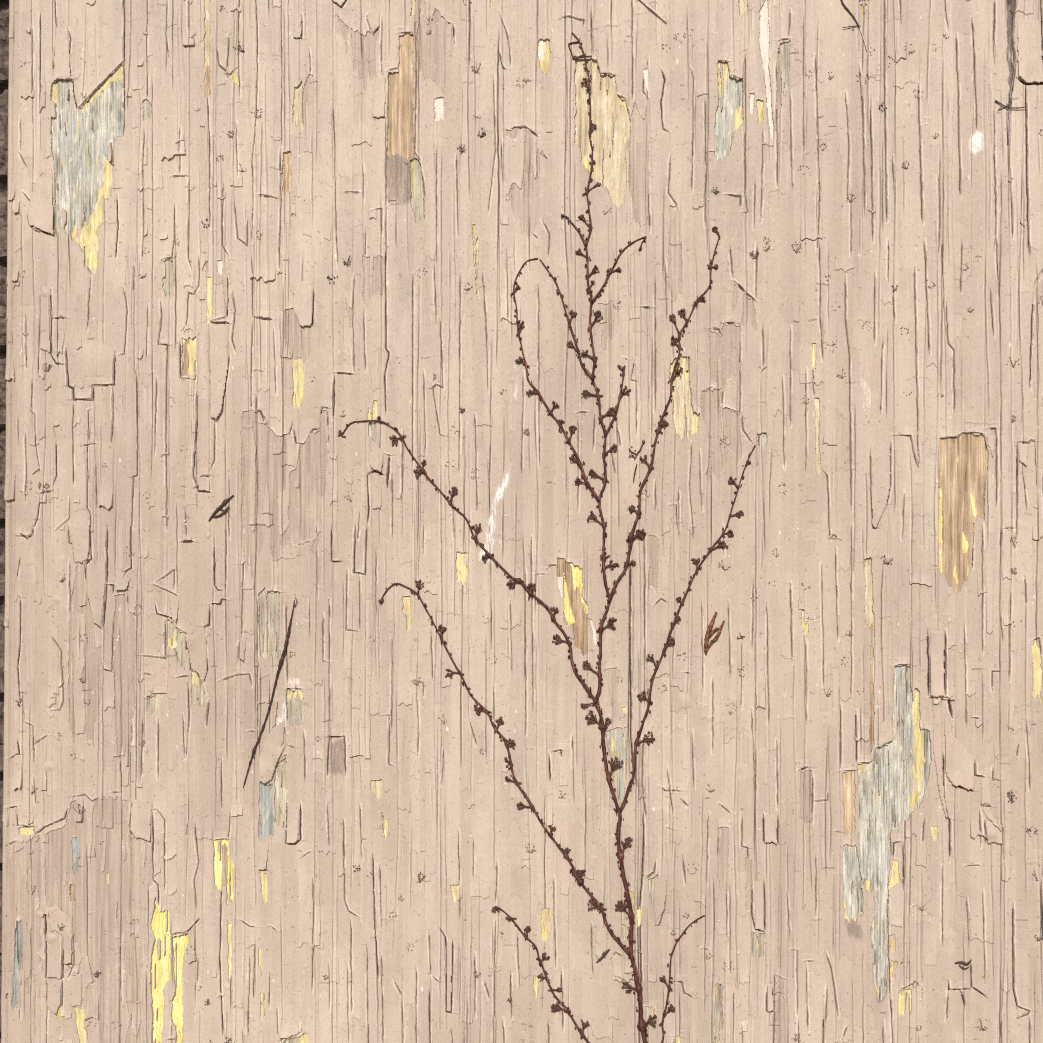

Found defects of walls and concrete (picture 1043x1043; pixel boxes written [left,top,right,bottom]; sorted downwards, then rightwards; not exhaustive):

peeling [27,28,124,274]
peeling [575,59,650,230]
peeling [715,0,790,161]
crack [5,0,508,846]
crack [564,0,1043,984]
peeling [938,434,994,593]
peeling [3,797,198,1043]
crack [130,809,276,1043]
crack [285,803,519,1043]
peeling [842,558,991,1016]
crack [882,757,1003,1043]
crack [1000,908,1030,1043]